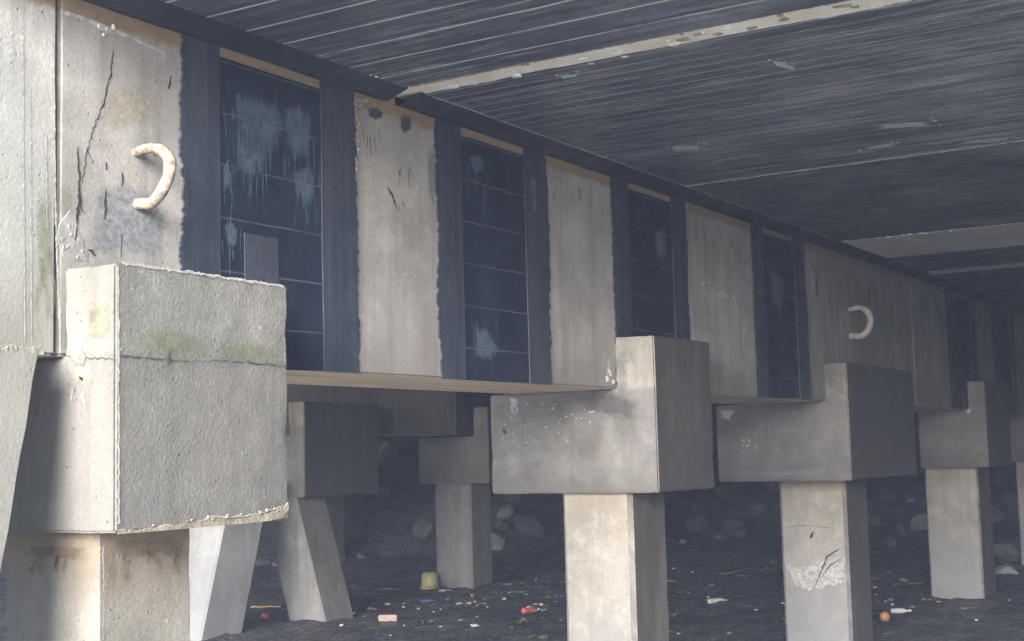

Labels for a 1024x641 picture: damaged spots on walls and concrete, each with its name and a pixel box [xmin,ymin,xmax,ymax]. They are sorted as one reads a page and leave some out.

crack [70,50,124,256]
damp [363,108,382,158]
damp [401,115,411,133]
damp [222,97,321,275]
damp [471,315,498,365]
crack [786,525,842,587]
peeling [786,556,846,591]